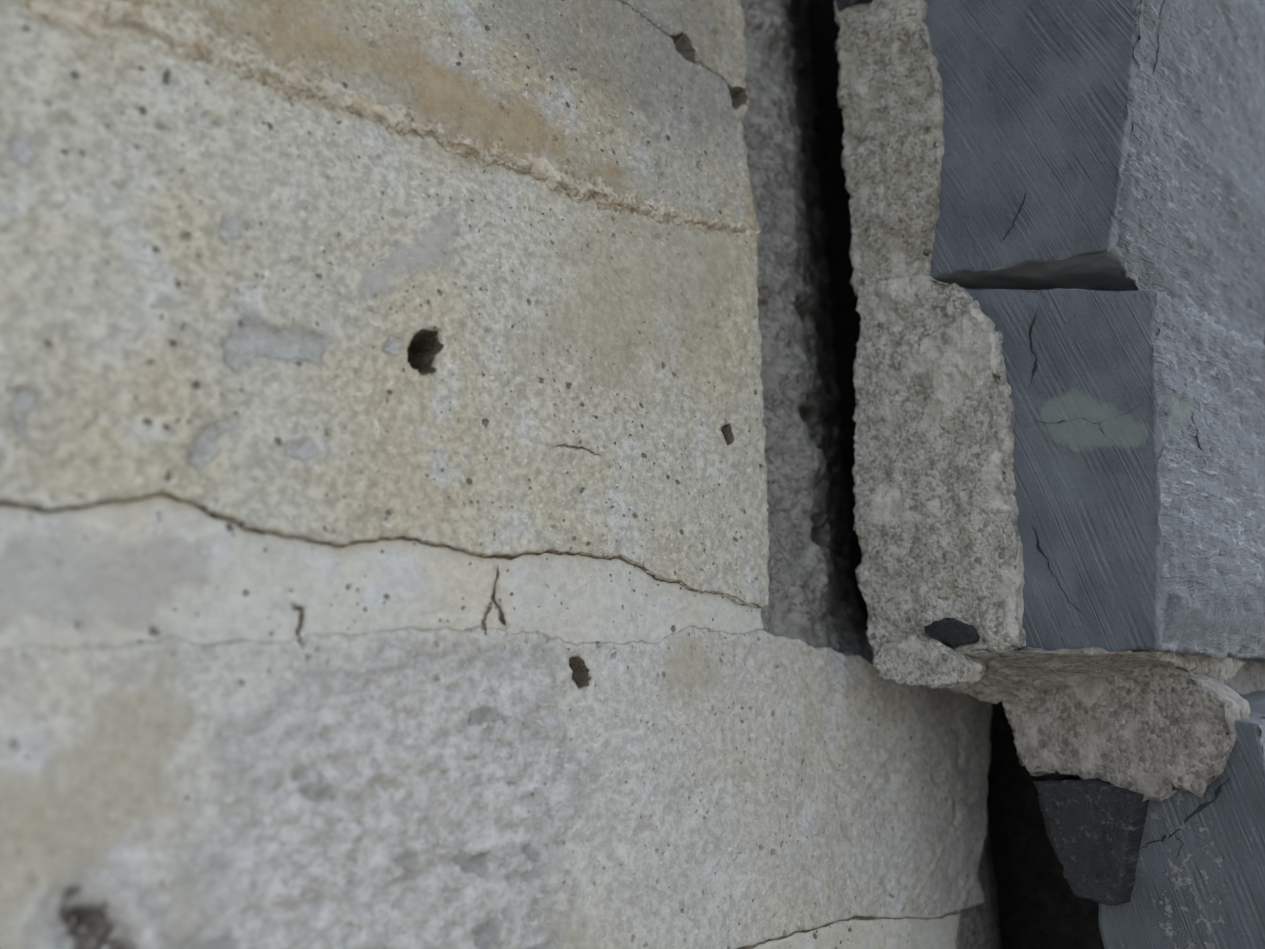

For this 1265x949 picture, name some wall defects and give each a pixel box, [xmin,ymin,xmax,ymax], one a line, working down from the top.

crack [619,1,671,37]
crack [695,60,748,106]
crack [555,444,606,456]
crack [0,491,761,635]
crack [293,604,304,646]
spalling [41,645,591,949]
crack [738,909,964,949]